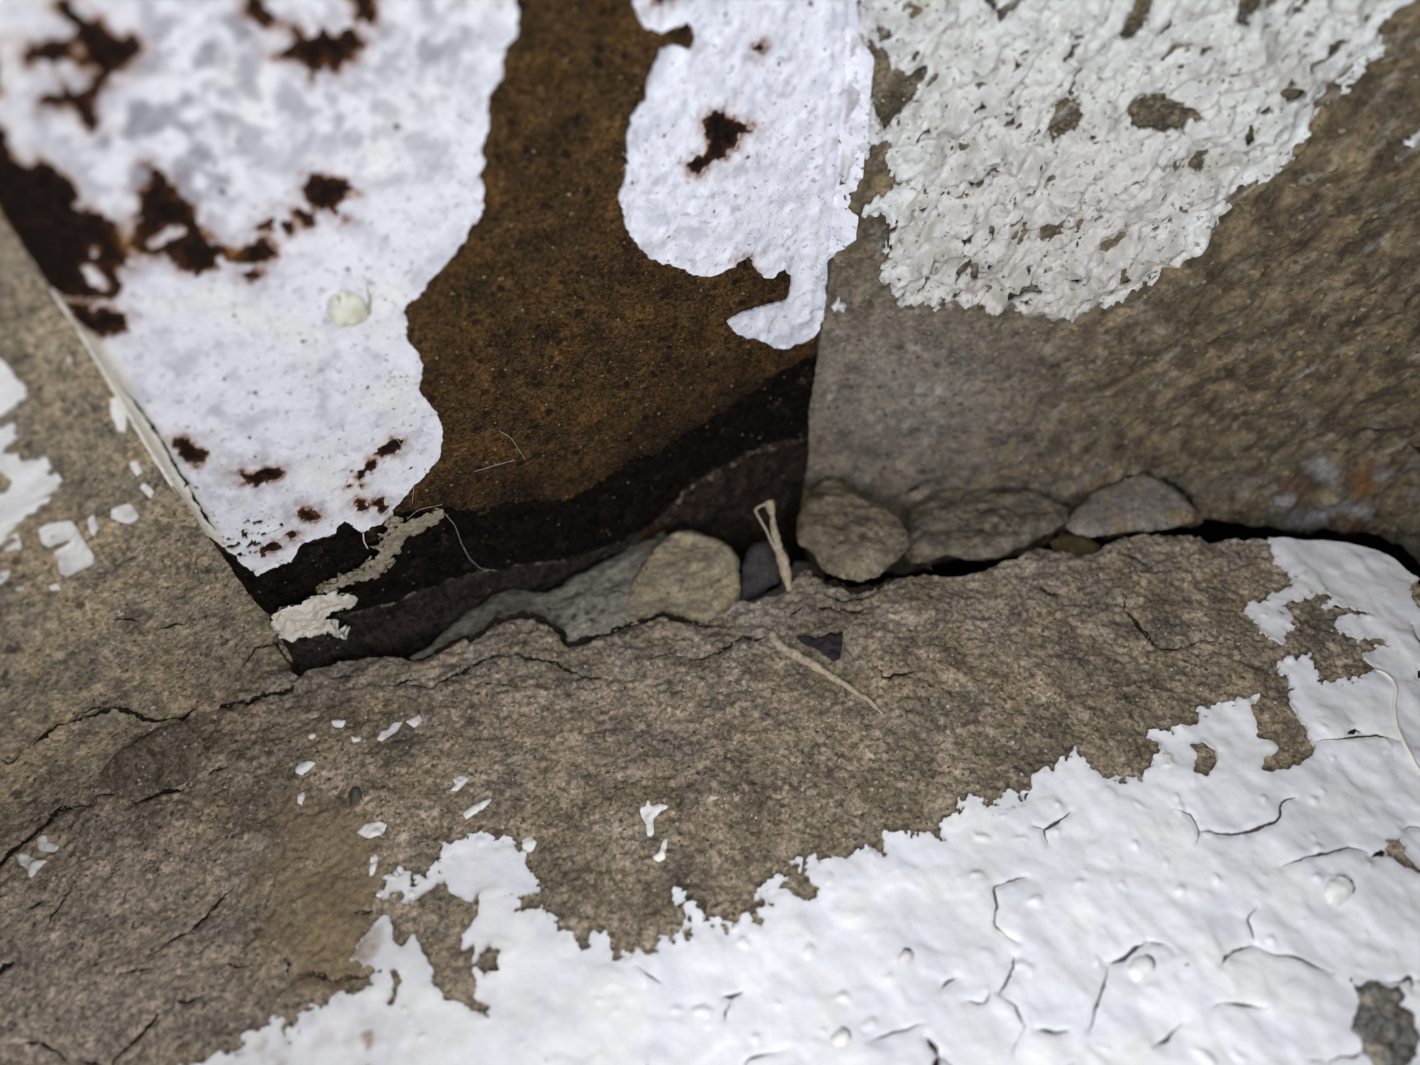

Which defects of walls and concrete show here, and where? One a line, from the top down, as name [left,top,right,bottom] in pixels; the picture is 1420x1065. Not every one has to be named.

corrosion [21,0,144,135]
corrosion [0,126,360,338]
corrosion [209,0,819,677]
peeling [801,0,1420,564]
corrosion [172,435,209,469]
crack [1,642,298,765]
peeling [0,212,1389,1065]
crack [336,472,1420,689]
peeling [1409,583,1420,608]
crack [0,763,232,866]
crack [1174,797,1296,843]
crack [941,877,1170,1065]